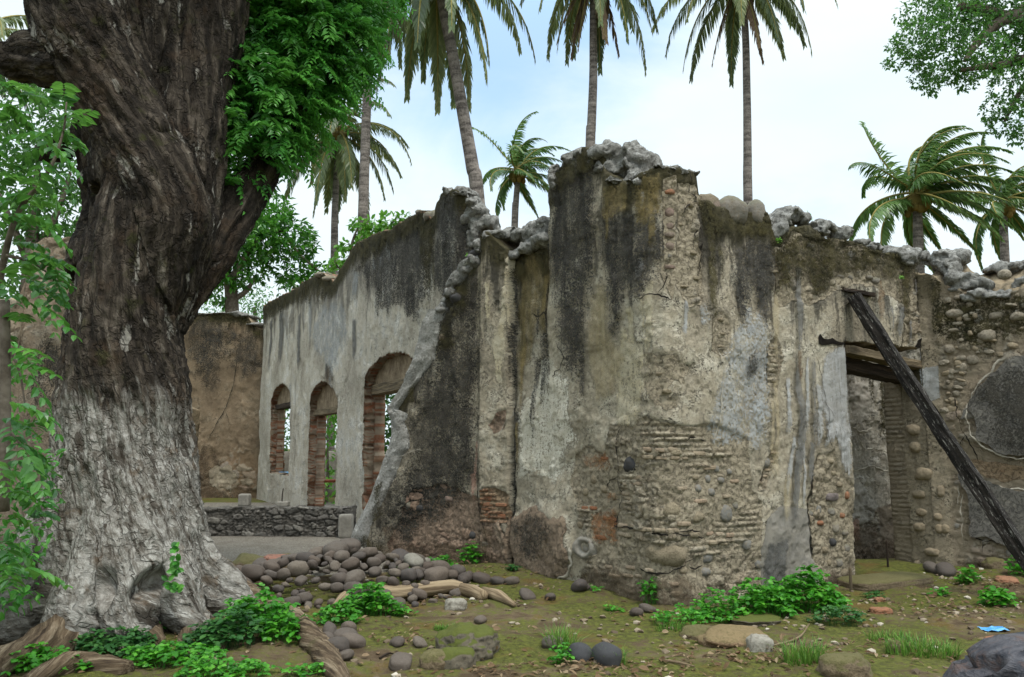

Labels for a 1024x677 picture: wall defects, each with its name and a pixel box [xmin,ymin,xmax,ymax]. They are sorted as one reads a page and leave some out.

damp [297,298,356,388]
damp [352,159,666,564]
spalling [570,175,778,606]
damp [684,197,918,514]
peeling [849,379,881,423]
spalling [964,358,1024,460]
spalling [387,484,514,564]
spalling [807,450,878,582]